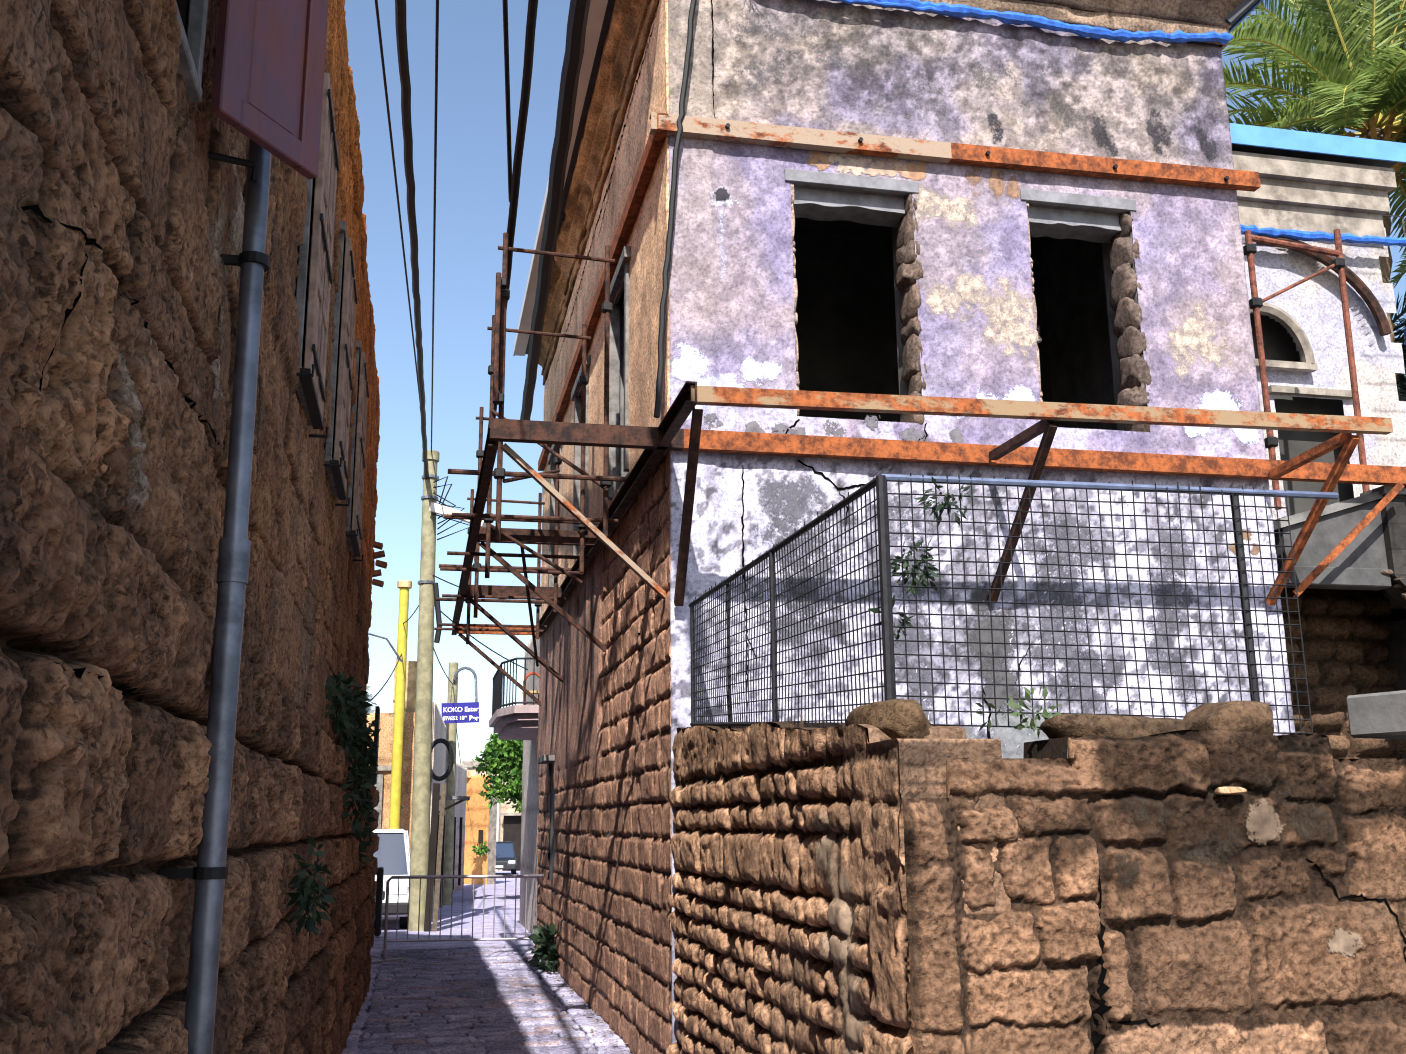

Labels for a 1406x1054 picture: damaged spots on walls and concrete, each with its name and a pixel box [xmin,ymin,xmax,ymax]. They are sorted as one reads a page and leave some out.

corrosion [807,150,935,181]
crack [21,205,102,391]
peeling [672,180,800,390]
spalling [895,185,1043,402]
crack [127,297,225,449]
peeling [687,405,730,430]
peeling [745,409,806,435]
crack [774,419,867,531]
peeling [824,420,846,437]
peeling [899,414,931,441]
peeling [950,416,982,443]
crack [1306,858,1406,961]